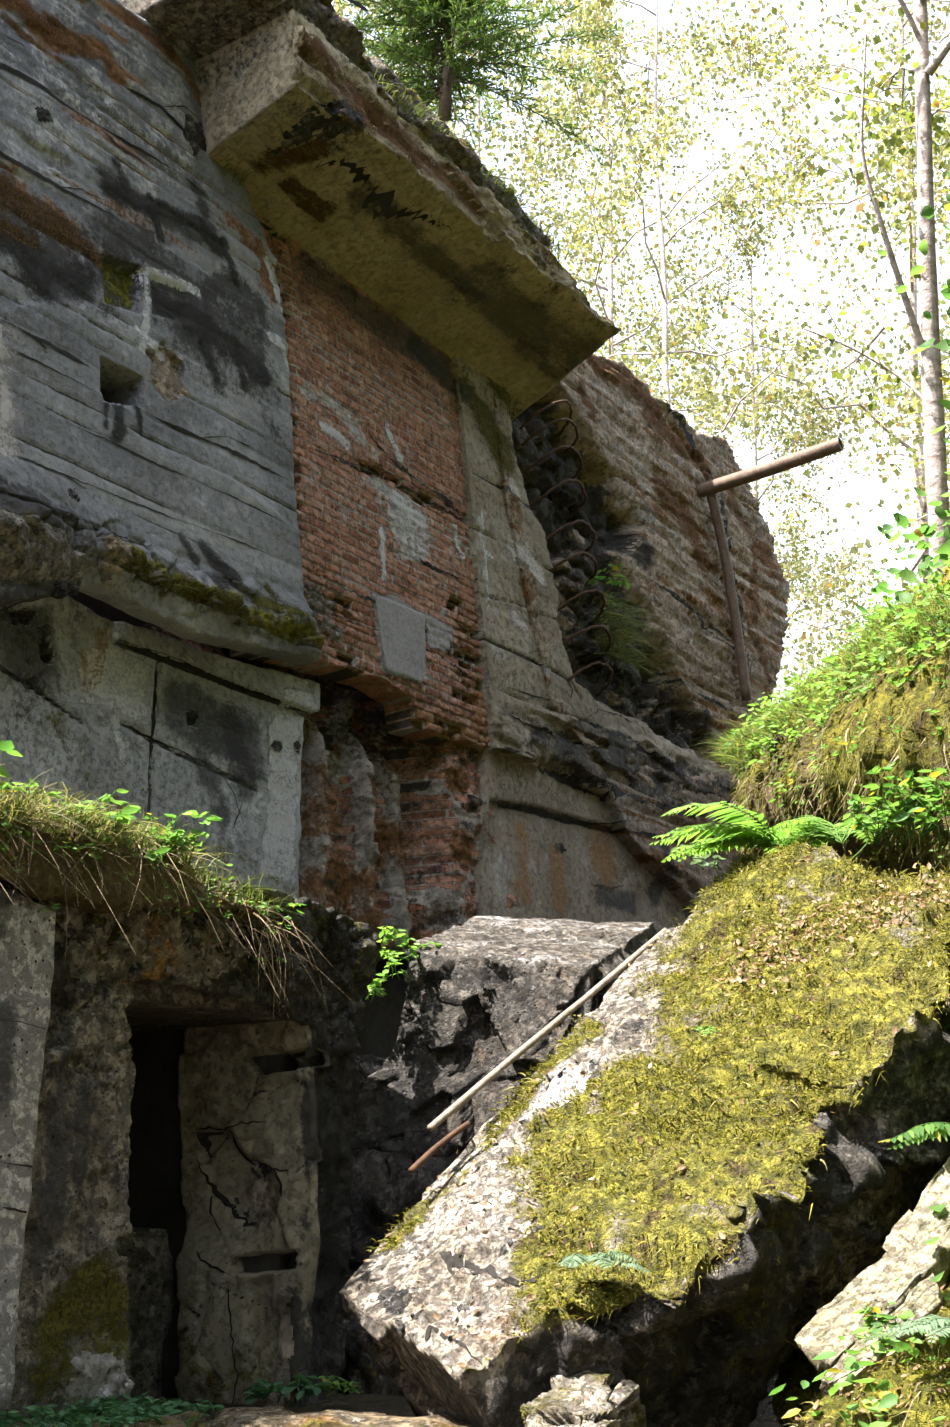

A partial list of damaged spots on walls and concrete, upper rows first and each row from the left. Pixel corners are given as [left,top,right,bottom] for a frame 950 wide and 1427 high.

rust [0,0,112,68]
rust [125,10,176,59]
rust [578,354,713,480]
rust [645,470,710,576]
spalling [303,582,344,641]
peeling [425,611,454,652]
rust [724,488,784,685]
peeling [279,688,312,709]
crack [196,1121,288,1404]